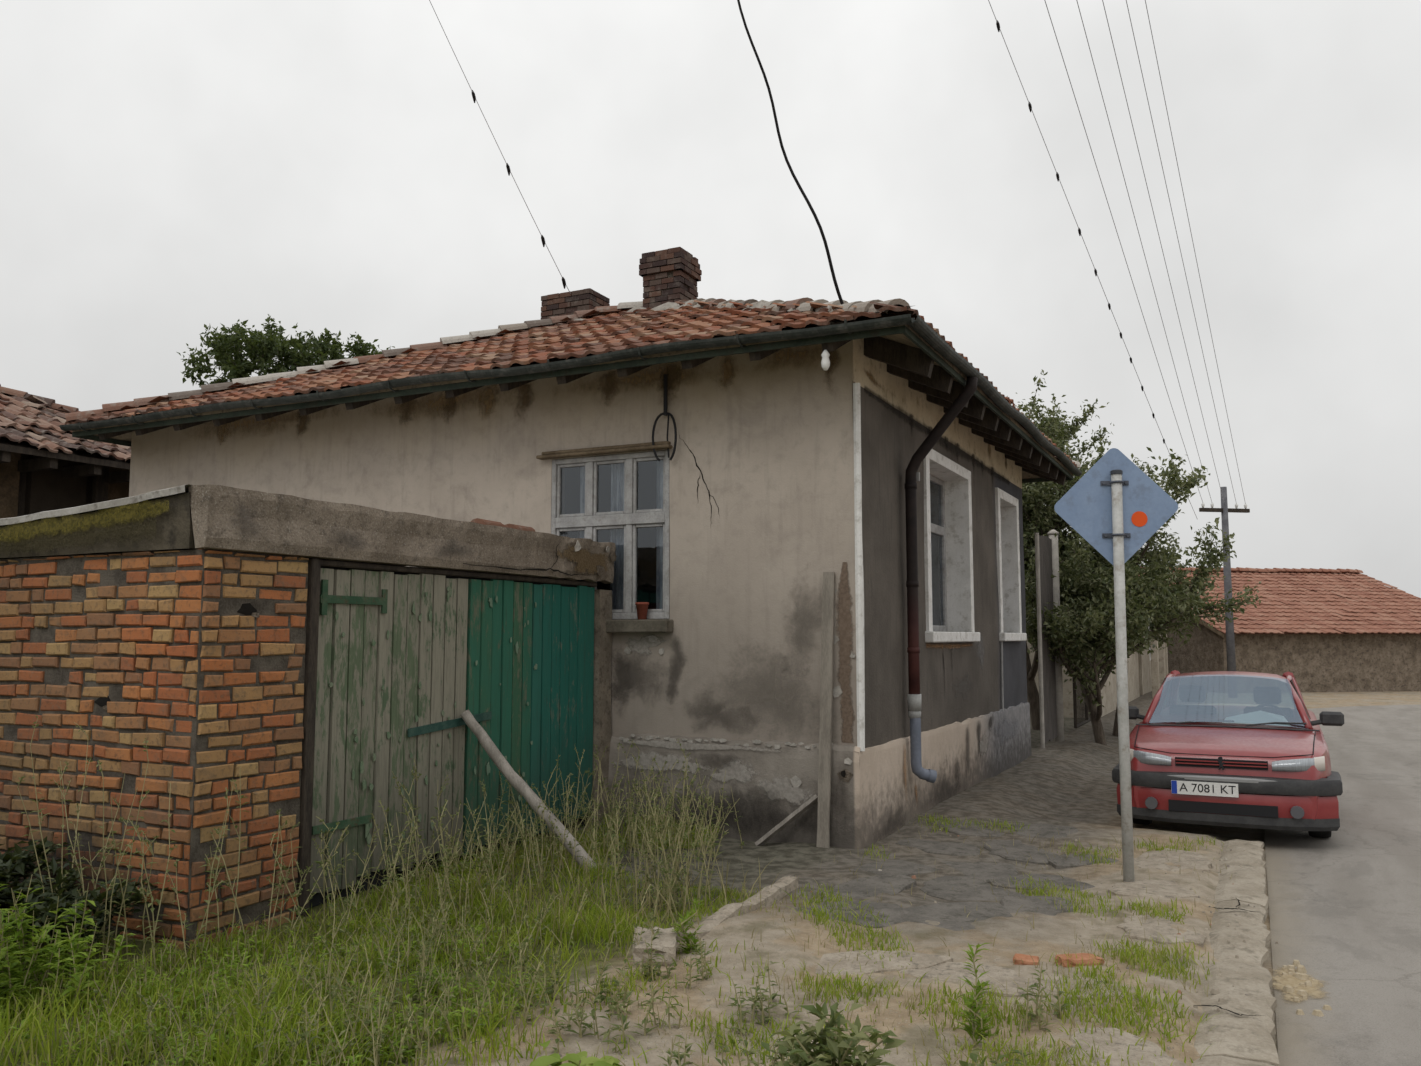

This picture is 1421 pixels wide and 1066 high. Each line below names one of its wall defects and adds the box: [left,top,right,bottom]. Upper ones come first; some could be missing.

water stain [773,348,837,374]
water stain [669,642,684,696]
spalling [613,734,819,805]
water stain [936,718,992,800]